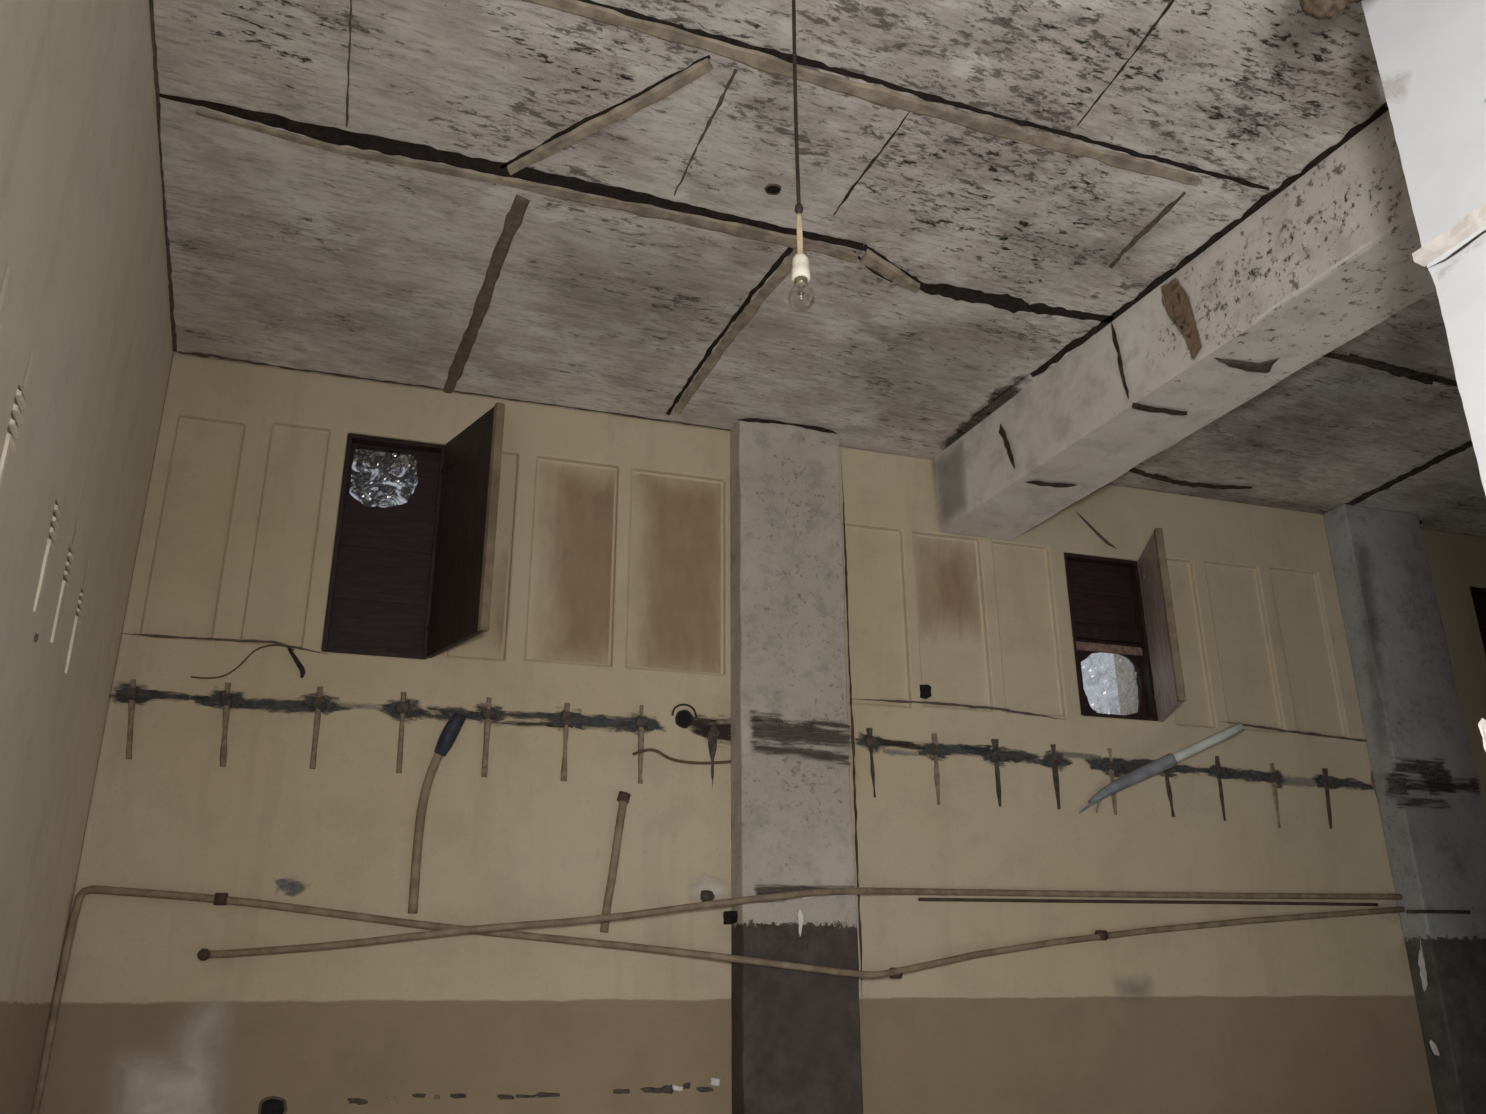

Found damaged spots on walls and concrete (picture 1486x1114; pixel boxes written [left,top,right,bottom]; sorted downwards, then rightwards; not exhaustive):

crack [1111,321,1187,416]
crack [121,0,1065,985]
crack [999,424,1117,549]
flaking render [1478,718,1486,752]